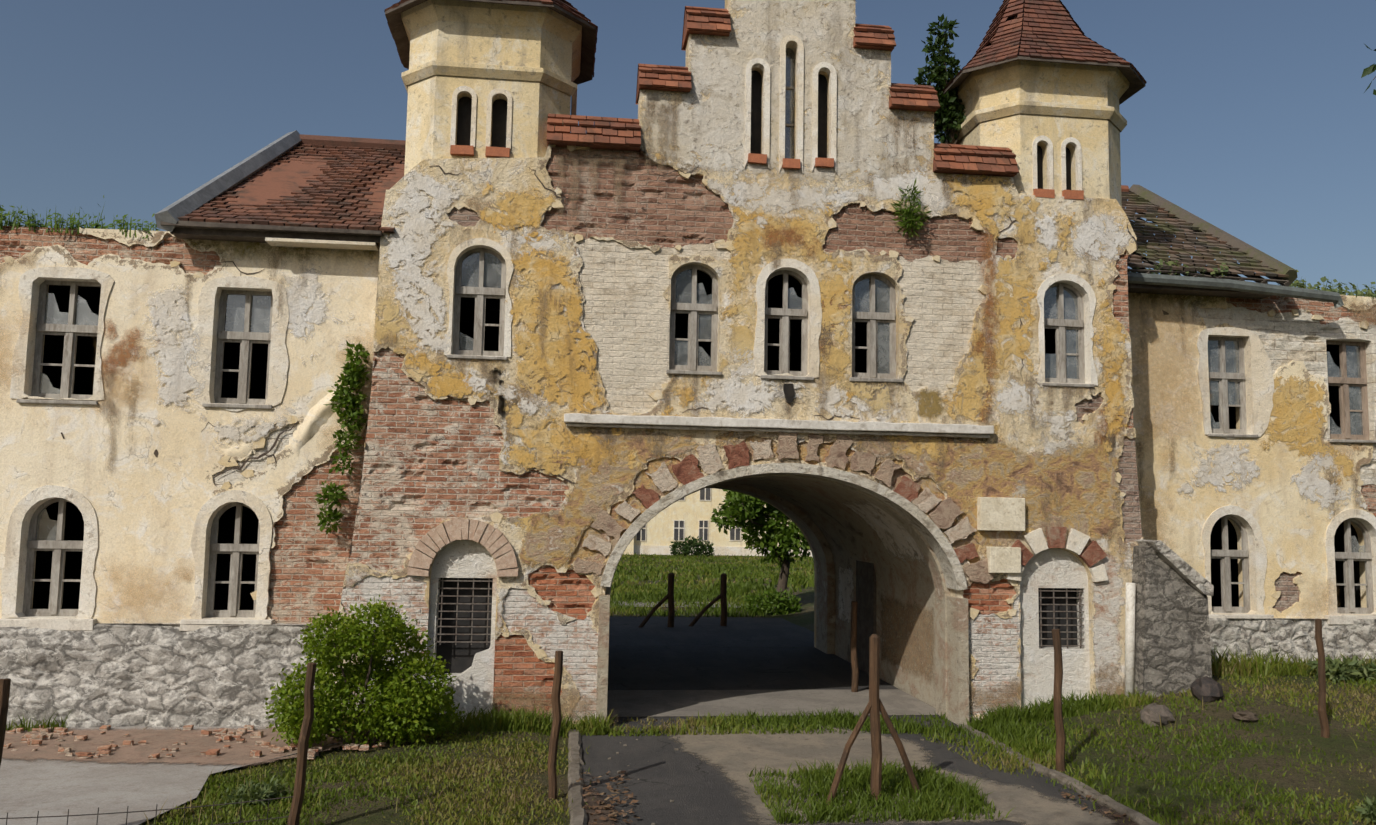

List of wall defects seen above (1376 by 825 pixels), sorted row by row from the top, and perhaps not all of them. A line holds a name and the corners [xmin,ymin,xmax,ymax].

spalling [0,226,304,494]
peeling [250,0,1142,722]
spalling [1177,295,1376,519]
spalling [1271,572,1305,613]